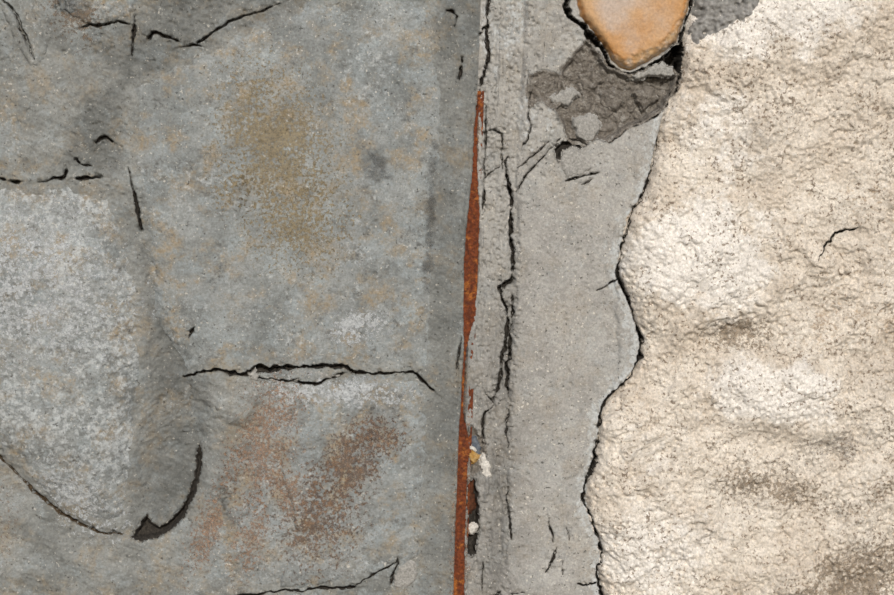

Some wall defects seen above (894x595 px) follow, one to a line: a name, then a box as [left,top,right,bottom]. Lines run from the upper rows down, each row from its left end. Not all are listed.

crack [4,0,35,59]
crack [82,4,277,56]
spalling [525,40,679,177]
crack [128,168,142,230]
crack [459,0,560,460]
crack [818,227,859,261]
crack [545,0,693,595]
crack [183,363,434,390]
crack [0,454,123,535]
crack [505,481,513,540]
crack [239,558,399,595]